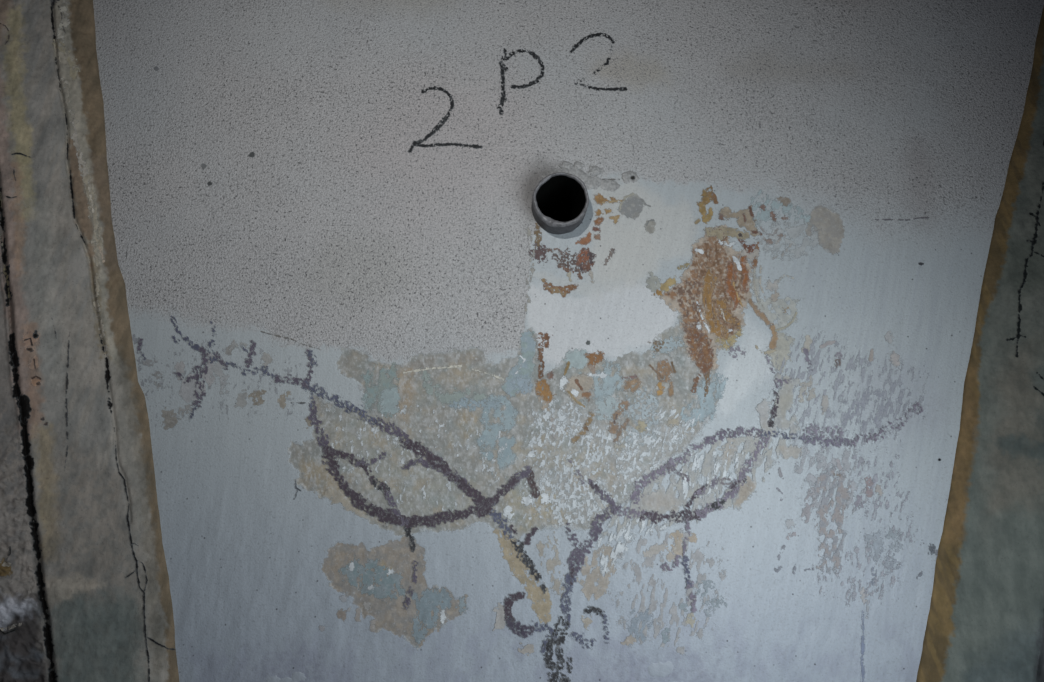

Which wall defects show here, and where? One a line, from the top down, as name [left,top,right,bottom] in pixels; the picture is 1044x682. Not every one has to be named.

crack [0,152,30,306]
rust [524,193,623,312]
peeling [617,192,656,234]
rust [646,186,762,397]
peeling [805,205,845,255]
crack [1006,182,1044,396]
crack [53,325,70,471]
peeling [132,334,301,430]
crack [6,332,58,682]
crack [99,334,176,682]
peeling [287,312,938,656]